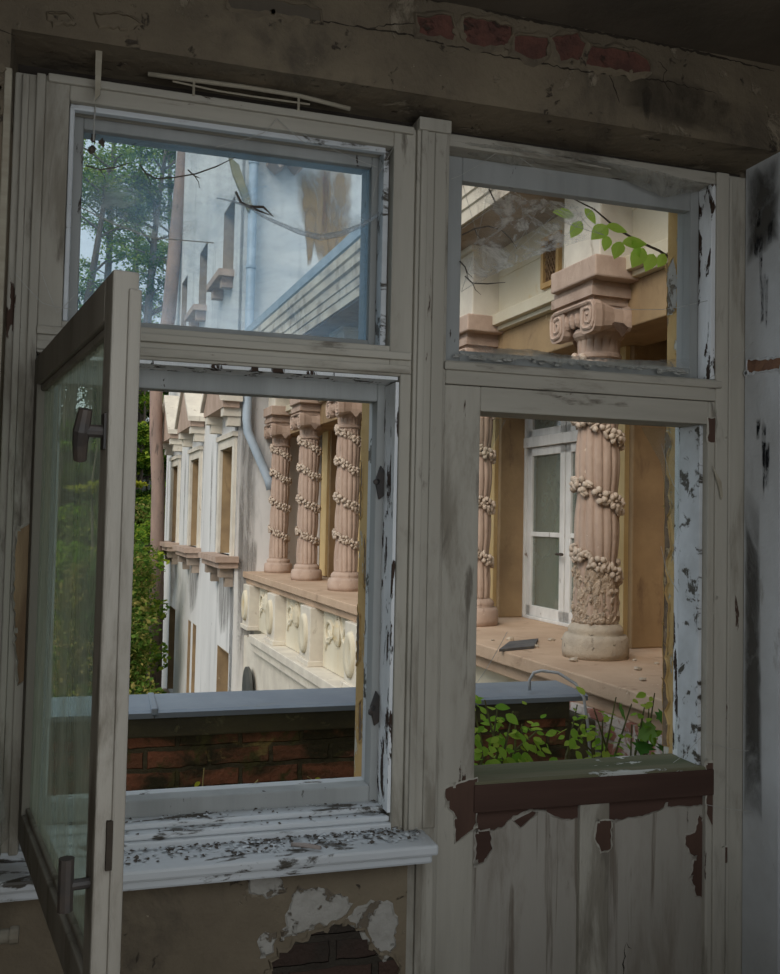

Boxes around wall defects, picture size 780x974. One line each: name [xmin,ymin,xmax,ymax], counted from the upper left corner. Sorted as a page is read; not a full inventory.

crack [323,9,772,103]
peeling [140,360,399,832]
peeling [124,826,425,864]
peeling [444,777,578,868]
peeling [594,795,713,898]
peeling [248,877,402,974]